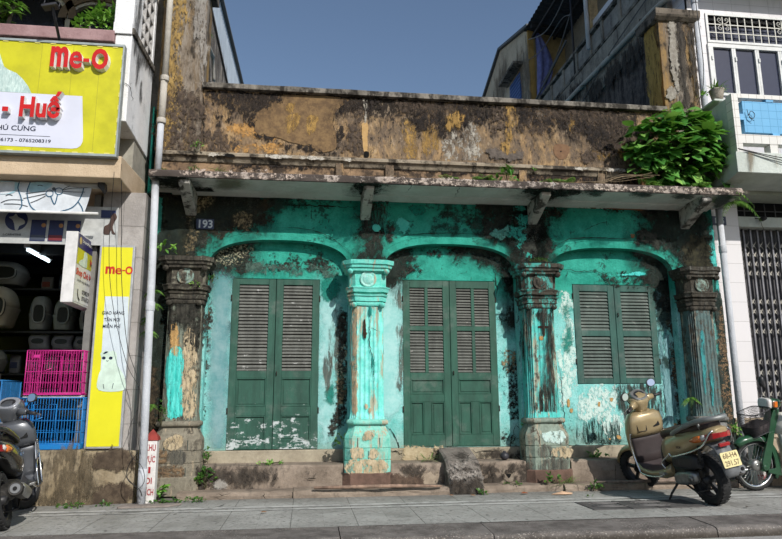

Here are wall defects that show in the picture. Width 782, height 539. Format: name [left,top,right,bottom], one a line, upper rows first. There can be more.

leakage [151,0,382,159]
peeling [438,121,482,161]
peeling [165,277,215,420]
leakage [147,176,339,434]
leakage [323,308,348,436]
peeling [350,306,371,417]
leakage [351,175,652,420]
peeling [562,306,574,353]
leakage [601,193,736,332]
leakage [36,439,139,506]
flaking render [344,430,485,495]
flaking render [538,430,573,470]